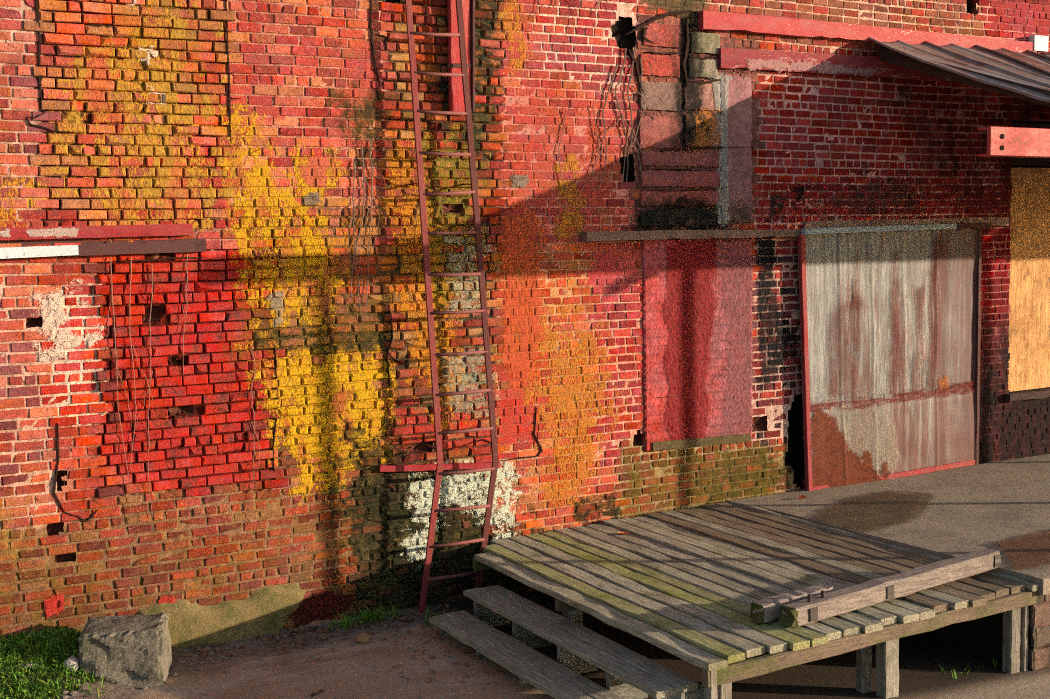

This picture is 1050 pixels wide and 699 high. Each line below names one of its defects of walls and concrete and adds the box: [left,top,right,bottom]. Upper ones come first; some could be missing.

spalling [611,16,636,56]
peeling [746,58,874,77]
leakage [626,0,732,440]
leakage [767,185,808,223]
peeling [26,316,106,363]
leakage [0,0,629,610]
leakage [751,237,798,390]
corrosion [810,236,976,488]
leakage [687,440,793,505]